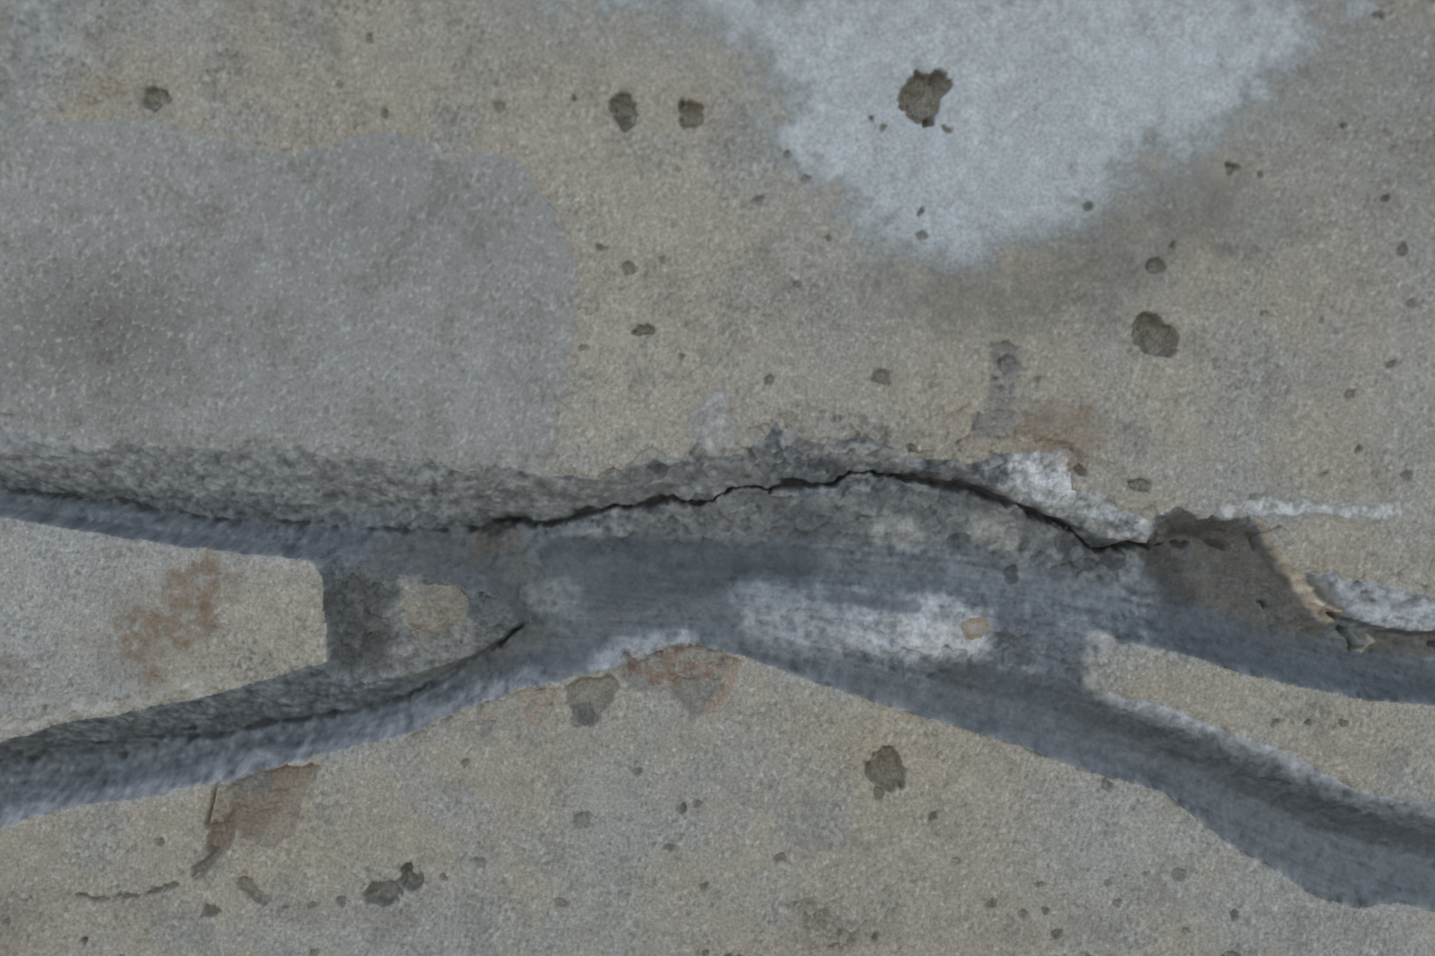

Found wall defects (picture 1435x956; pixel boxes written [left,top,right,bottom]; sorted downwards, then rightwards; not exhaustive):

damp [681,0,1319,273]
spalling [969,340,1334,635]
peeling [0,670,223,742]
spalling [319,551,529,686]
spalling [562,640,745,728]
crack [0,422,1435,912]
spalling [61,762,326,904]
spalling [788,894,865,956]